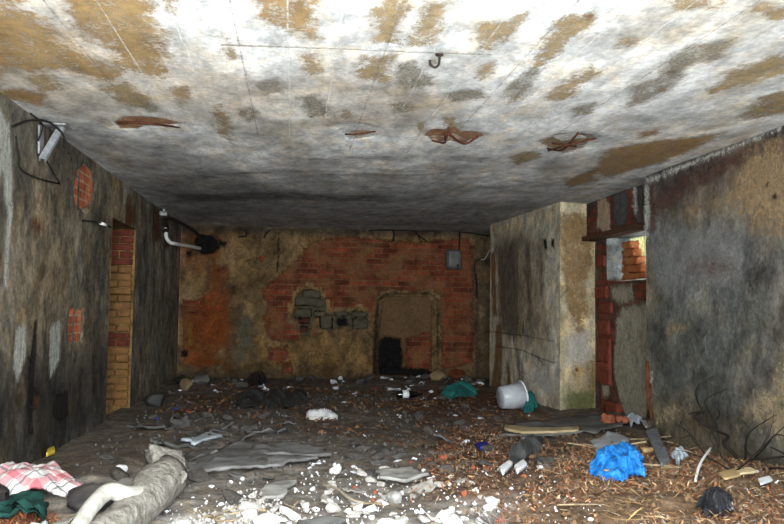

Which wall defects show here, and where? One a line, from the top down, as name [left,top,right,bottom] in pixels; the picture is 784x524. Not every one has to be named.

peeling [0,0,180,128]
peeling [630,40,732,106]
peeling [710,55,784,94]
spalling [336,110,378,139]
spalling [417,118,483,145]
spalling [509,132,596,165]
peeling [736,91,784,120]
water stain [0,114,13,286]
flaking render [73,163,96,213]
flaking render [588,127,784,429]
efflorescence [14,327,26,378]
water stain [50,323,61,375]